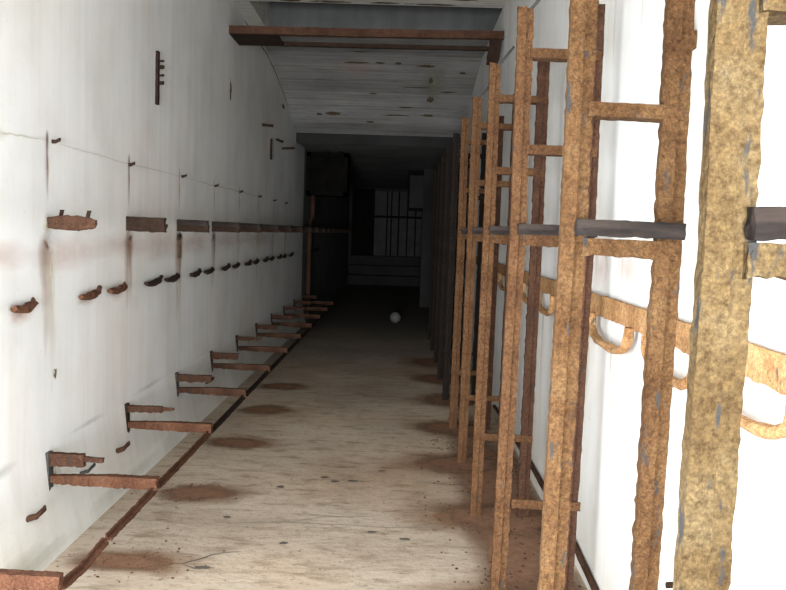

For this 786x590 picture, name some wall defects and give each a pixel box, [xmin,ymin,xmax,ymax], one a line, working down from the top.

crack [0,132,261,198]
corrosion [417,395,475,406]
corrosion [242,406,290,414]
corrosion [210,438,271,448]
corrosion [164,485,238,500]
corrosion [409,421,497,590]
corrosion [506,460,542,590]
corrosion [78,553,179,571]